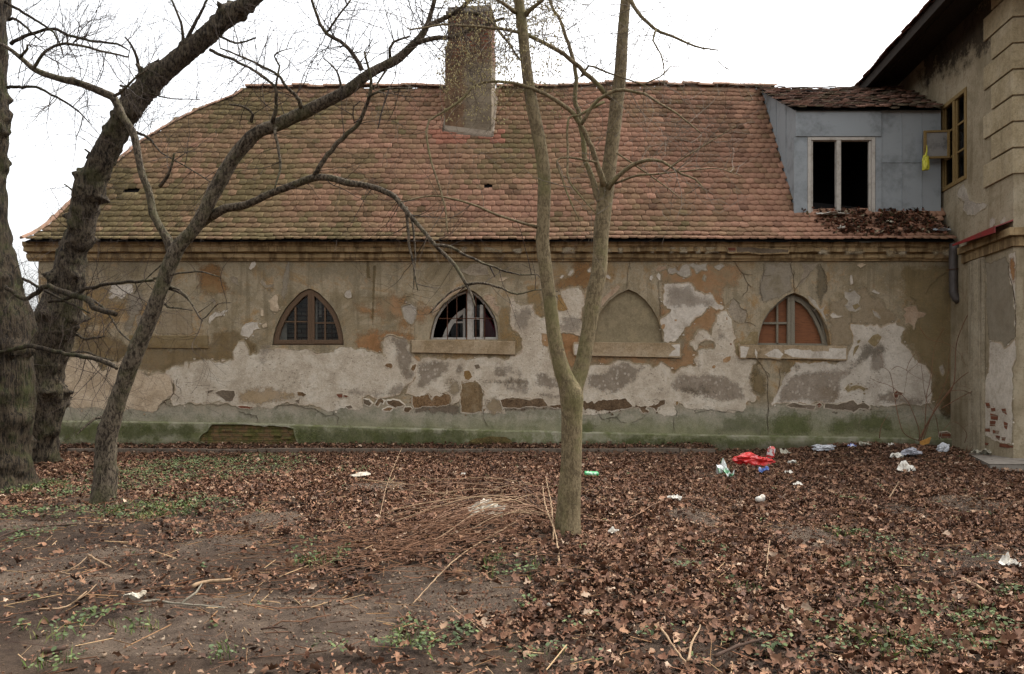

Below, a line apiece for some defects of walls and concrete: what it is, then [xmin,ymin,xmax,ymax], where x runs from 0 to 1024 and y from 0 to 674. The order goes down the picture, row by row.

flaking render [64,353,124,412]
flaking render [197,423,298,445]
flaking render [124,293,561,416]
flaking render [558,266,591,355]
flaking render [583,247,945,418]
flaking render [985,251,1017,448]